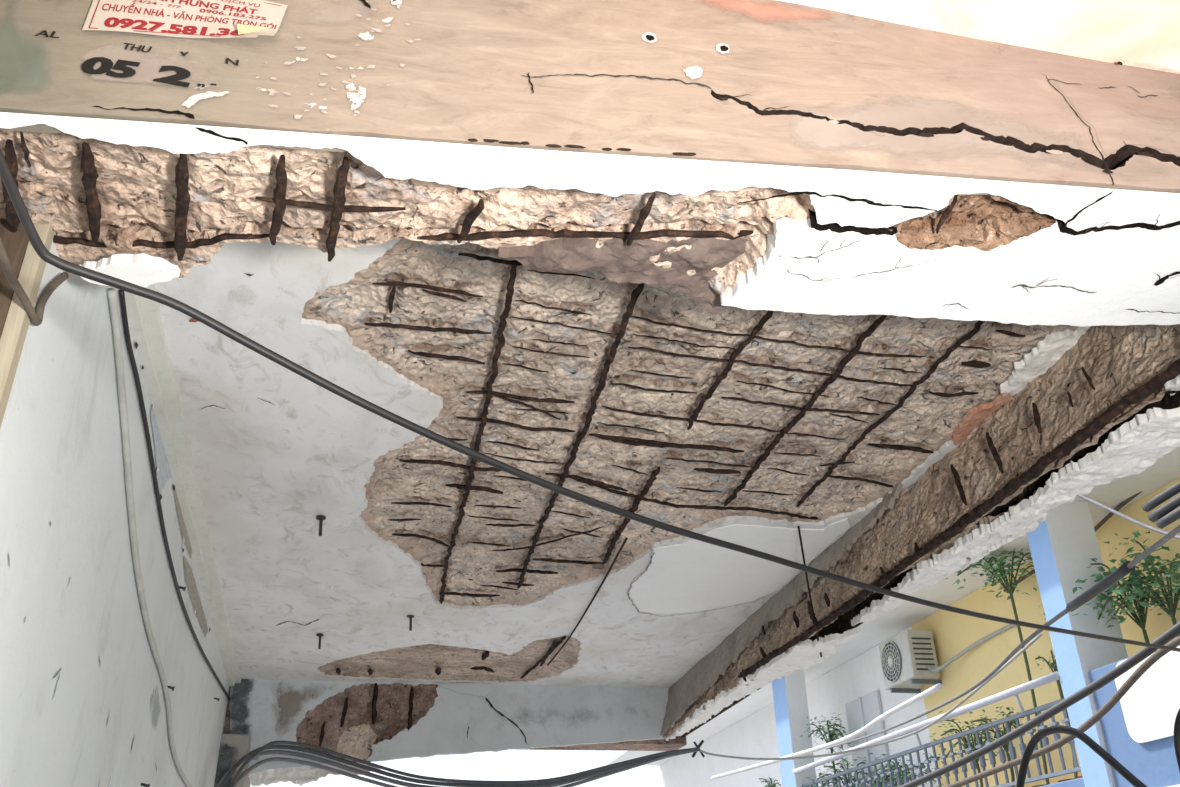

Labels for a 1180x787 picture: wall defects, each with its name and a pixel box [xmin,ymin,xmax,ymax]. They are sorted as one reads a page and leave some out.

crack [522,74,1180,236]
crack [737,191,938,282]
crack [1012,279,1096,293]
crack [1126,271,1180,314]
spalling [0,130,1180,741]
spalling [248,635,580,787]
crack [485,697,527,744]